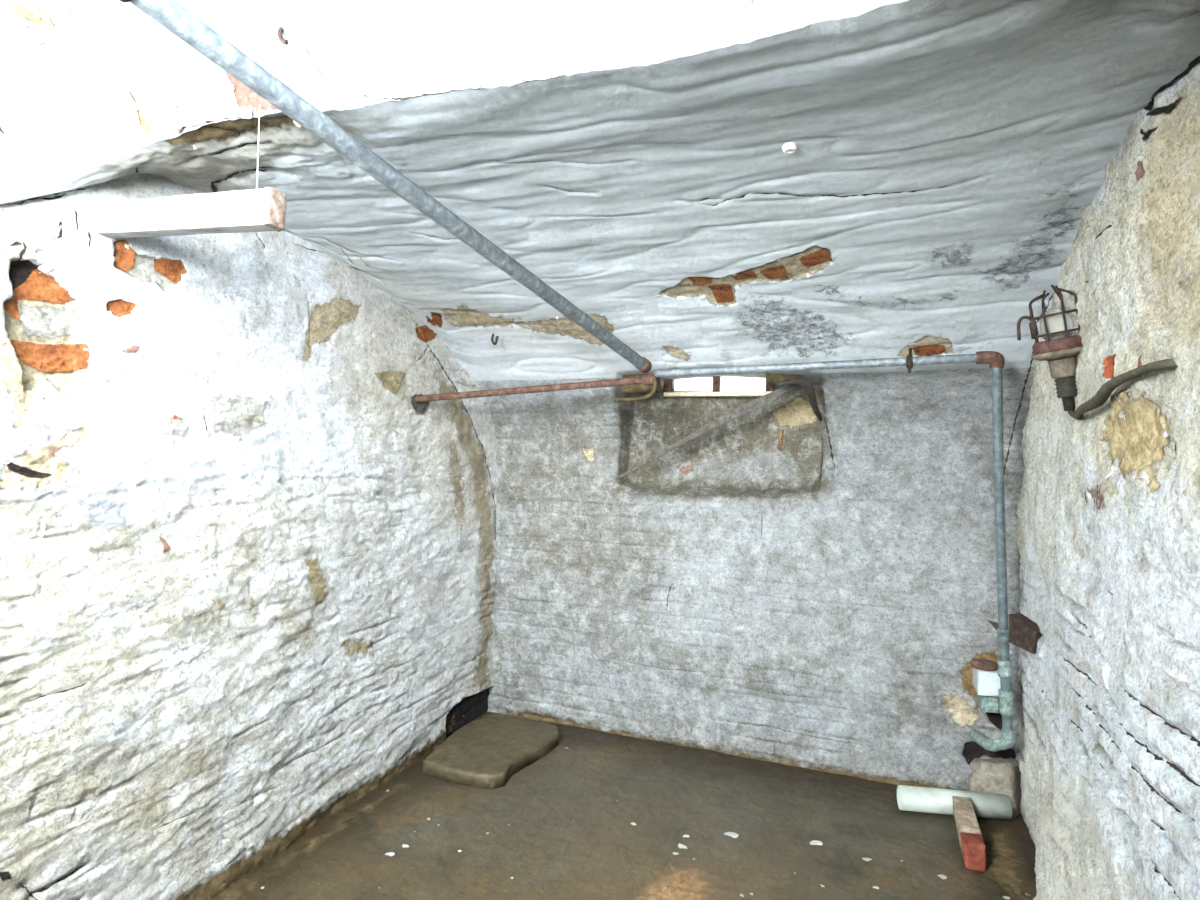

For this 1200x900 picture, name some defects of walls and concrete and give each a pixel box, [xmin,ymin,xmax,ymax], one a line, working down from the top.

peeling [130,72,301,150]
crack [1140,97,1182,142]
spalling [657,246,833,306]
spalling [0,260,91,428]
flaking render [302,297,361,361]
spalling [415,312,442,342]
peeling [516,313,614,346]
peeling [0,427,87,490]
flaking render [1083,354,1172,509]
crack [1039,654,1200,900]
crack [21,865,84,900]